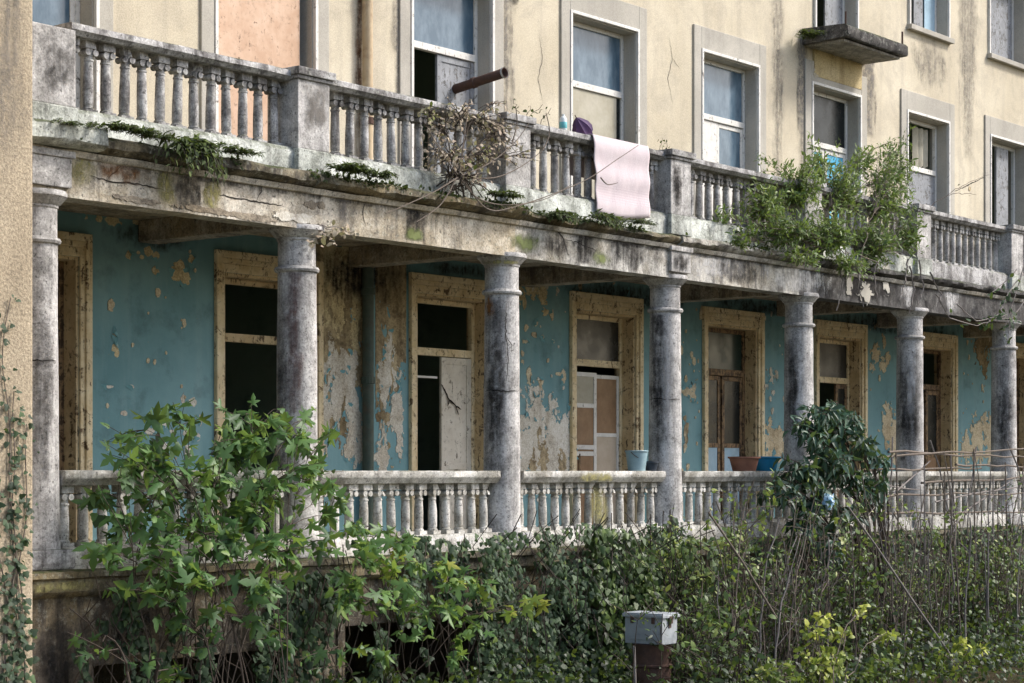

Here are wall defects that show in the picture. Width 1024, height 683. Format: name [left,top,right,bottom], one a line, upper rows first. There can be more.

peeling [125,246,197,299]
water stain [261,186,389,222]
water stain [324,256,396,300]
water stain [407,209,425,233]
water stain [549,232,595,263]
water stain [609,240,655,265]
spalling [845,258,890,306]
peeling [316,244,407,471]
peeling [519,286,579,471]
water stain [574,283,671,425]
peeling [960,337,992,468]
peeling [870,400,896,465]